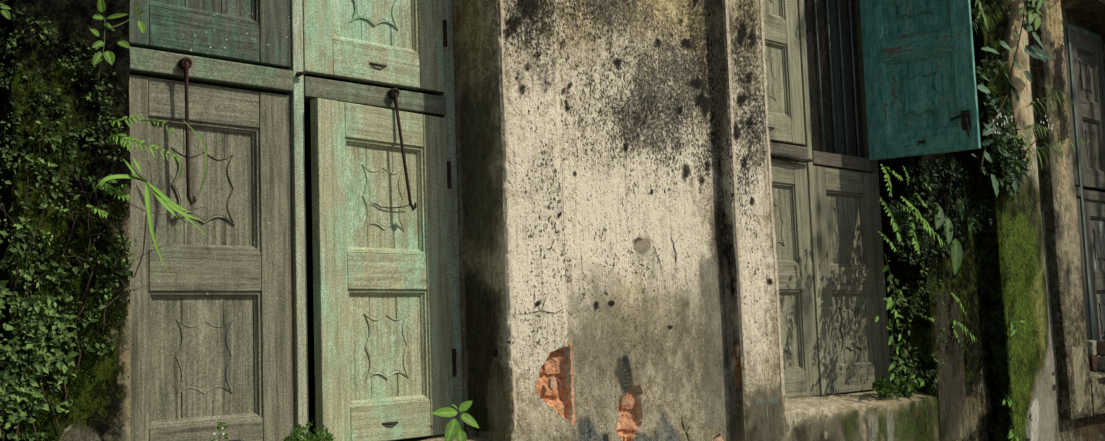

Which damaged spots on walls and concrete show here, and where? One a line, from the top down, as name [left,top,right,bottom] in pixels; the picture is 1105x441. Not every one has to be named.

leakage [505,0,573,112]
leakage [576,0,718,185]
leakage [729,0,771,185]
flaking render [535,342,680,441]
leakage [688,200,733,436]
leakage [747,387,894,441]
leakage [934,292,967,440]
leakage [1030,397,1039,441]